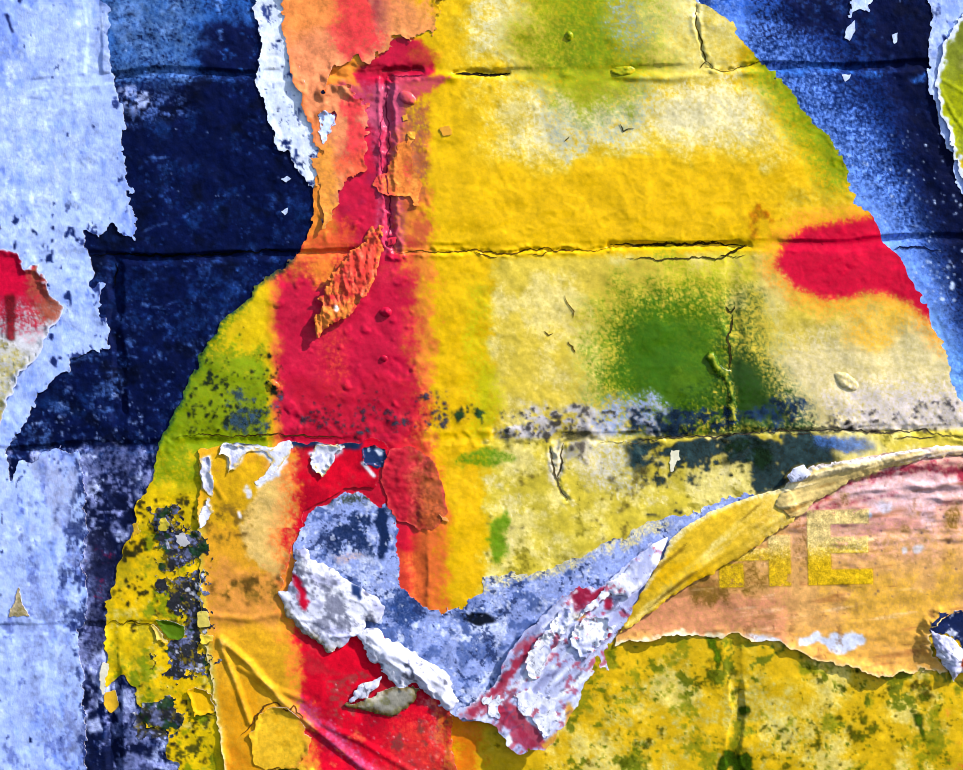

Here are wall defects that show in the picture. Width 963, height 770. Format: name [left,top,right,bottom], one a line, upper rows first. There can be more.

crack [695,10,760,72]
crack [456,70,510,78]
peeling [318,110,336,144]
peeling [373,131,422,206]
crack [379,75,746,262]
peeling [314,225,397,338]
crack [726,306,735,369]
peeling [669,450,680,472]
peeling [929,610,963,649]